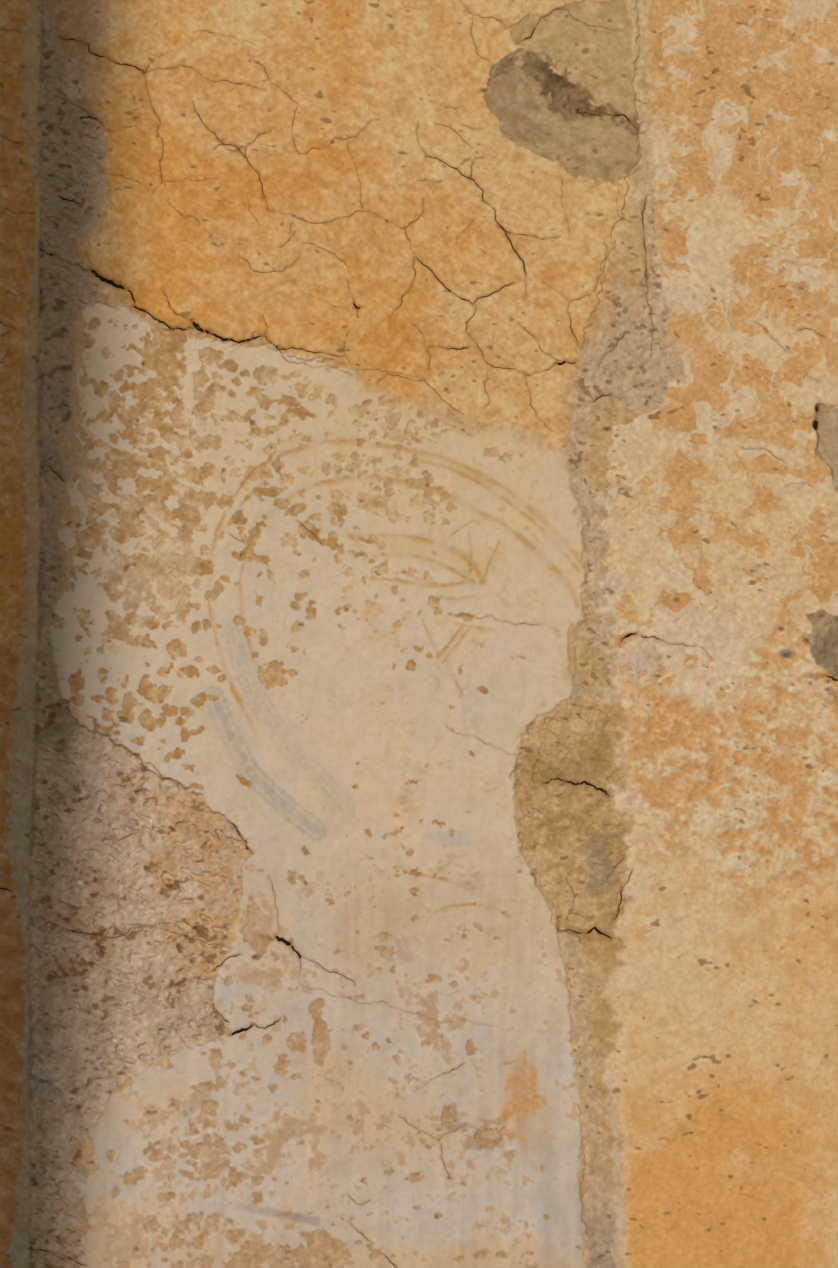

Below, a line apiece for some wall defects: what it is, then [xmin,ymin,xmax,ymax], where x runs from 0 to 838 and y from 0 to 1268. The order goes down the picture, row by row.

crack [464,1,609,67]
crack [39,30,655,434]
peeling [577,0,838,645]
peeling [395,596,476,628]
spalling [29,49,459,1268]
peeling [625,654,731,703]
peeling [467,1041,478,1056]
peeling [454,1222,535,1265]